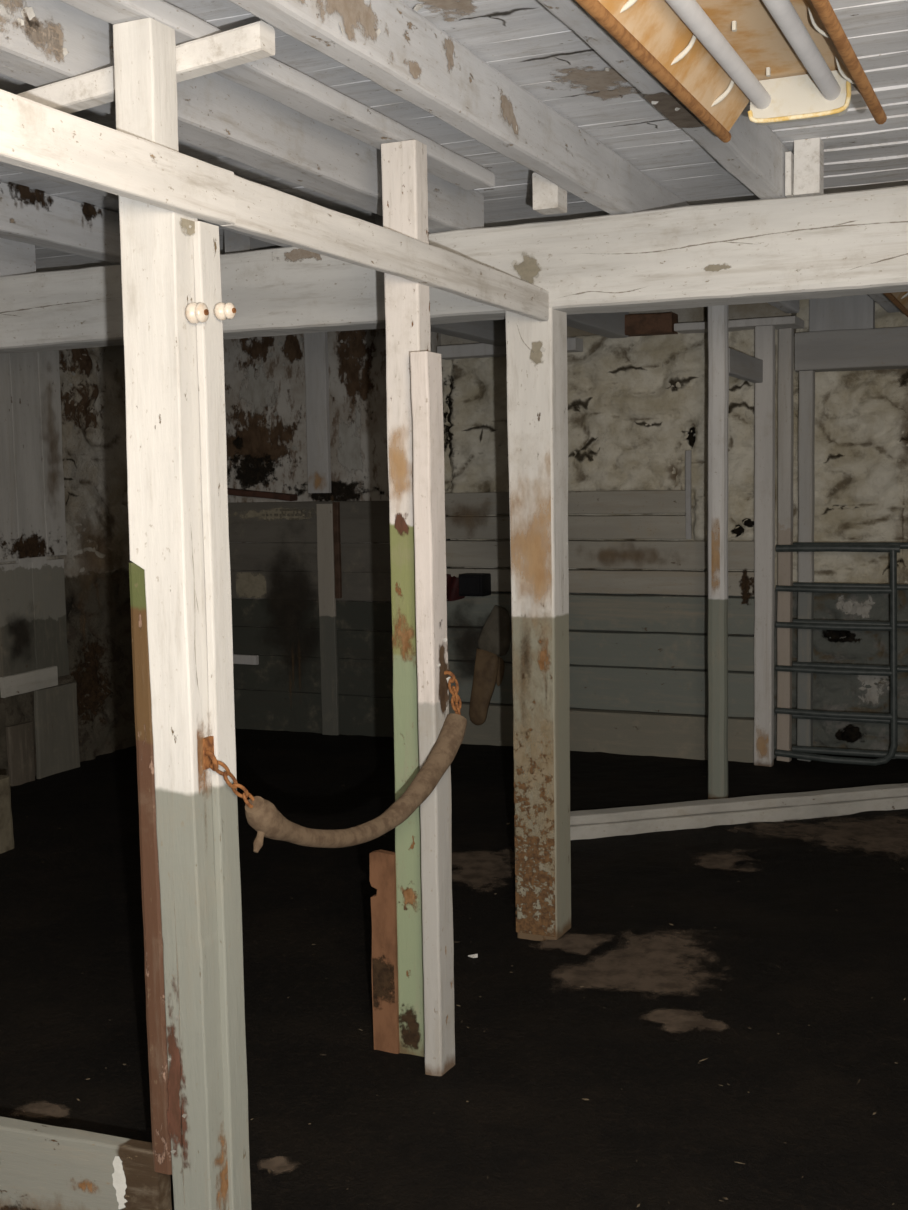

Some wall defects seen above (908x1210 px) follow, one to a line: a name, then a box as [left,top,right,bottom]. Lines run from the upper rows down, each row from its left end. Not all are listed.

peeling [0,0,68,62]
peeling [301,0,388,41]
peeling [59,348,105,430]
peeling [237,334,304,372]
peeling [333,330,386,424]
peeling [224,374,302,490]
rust [389,433,409,495]
rust [395,513,409,535]
rust [511,497,552,600]
rust [392,615,416,663]
rust [197,730,207,792]
rust [513,640,556,937]